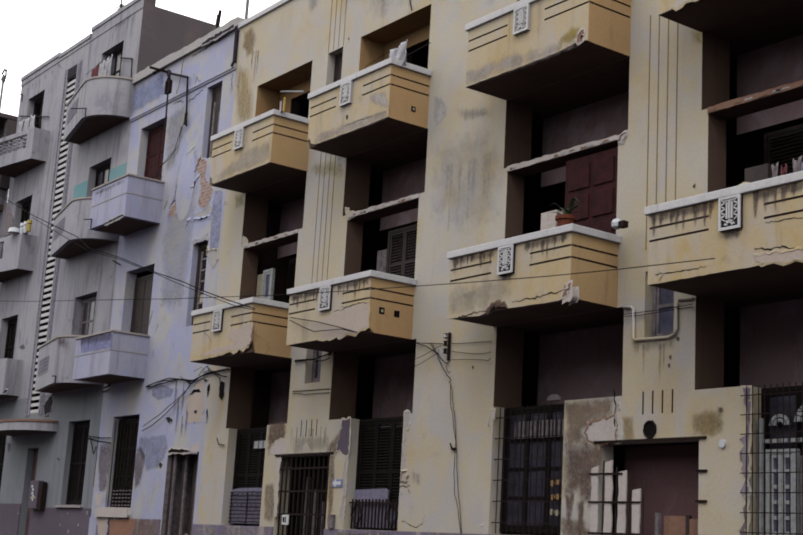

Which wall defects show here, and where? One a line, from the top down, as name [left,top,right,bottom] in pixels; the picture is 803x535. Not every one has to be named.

peeling [671,0,698,11]
spalling [554,130,629,157]
spalling [184,155,222,269]
spalling [753,246,803,267]
peeling [199,321,253,359]
spalling [584,401,624,446]
peeling [139,436,200,469]
damp [562,399,611,535]
spalling [86,491,136,535]